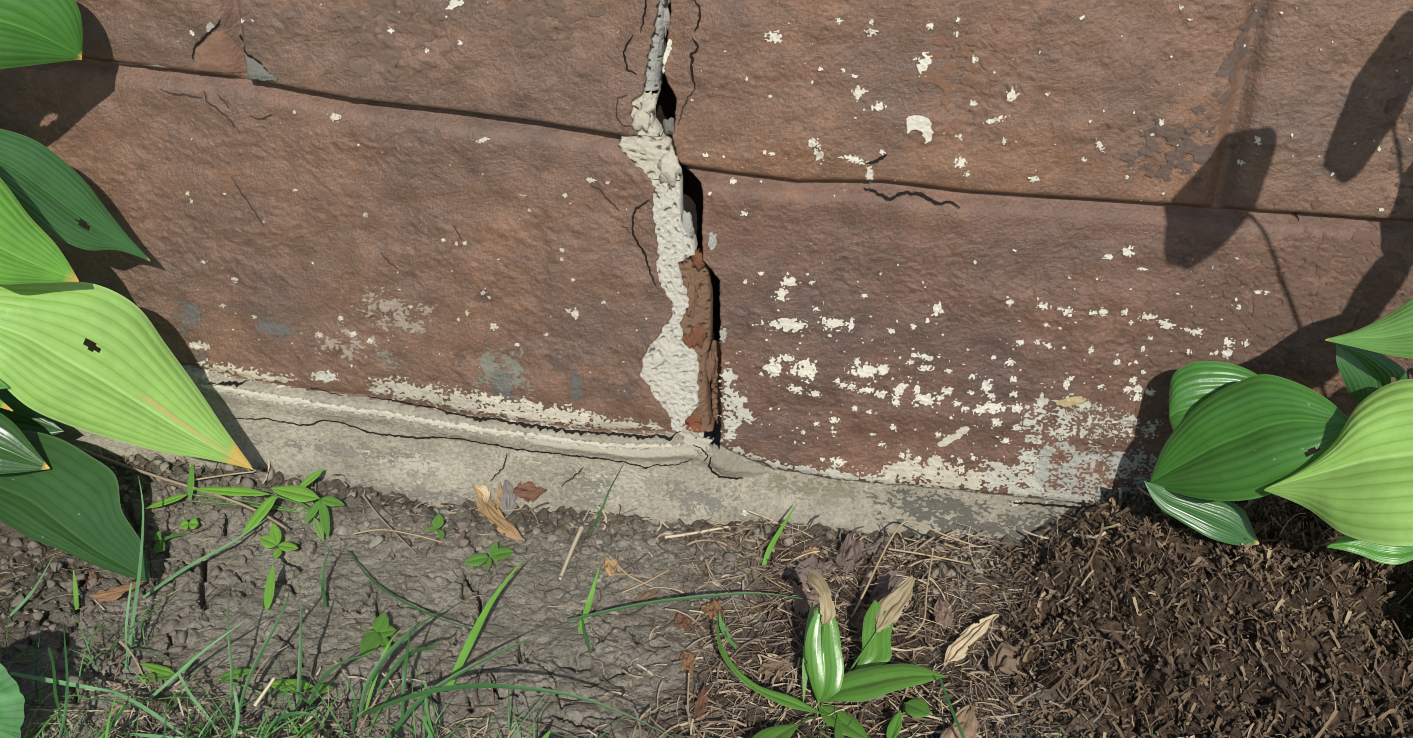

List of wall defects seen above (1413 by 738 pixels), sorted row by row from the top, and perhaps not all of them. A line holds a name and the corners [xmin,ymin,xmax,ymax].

peeling [244,49,277,81]
crack [231,178,263,225]
crack [590,0,721,406]
crack [864,152,960,208]
spalling [366,0,1204,493]
peeling [1209,337,1250,359]
crack [208,380,743,487]